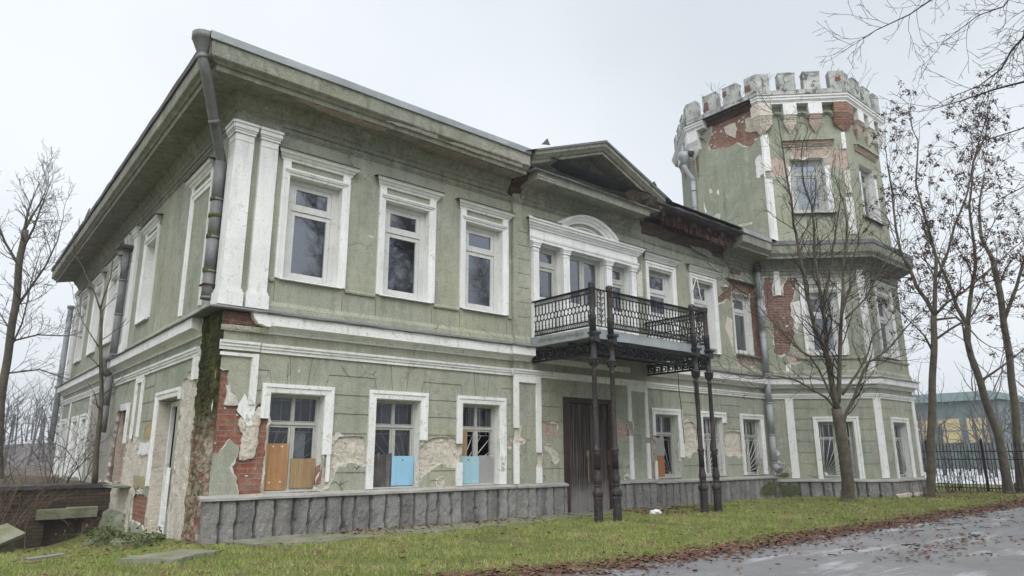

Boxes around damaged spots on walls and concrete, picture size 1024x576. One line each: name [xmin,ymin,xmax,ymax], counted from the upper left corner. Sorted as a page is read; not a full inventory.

flaking render [387,121,555,196]
flaking render [708,110,848,178]
flaking render [718,269,806,368]
flaking render [85,390,150,532]
flaking render [166,376,198,540]
flaking render [210,367,271,495]
flaking render [312,432,367,492]
flaking render [414,436,462,487]
flaking render [536,422,560,467]
flaking render [616,419,634,444]
flaking render [677,419,698,461]